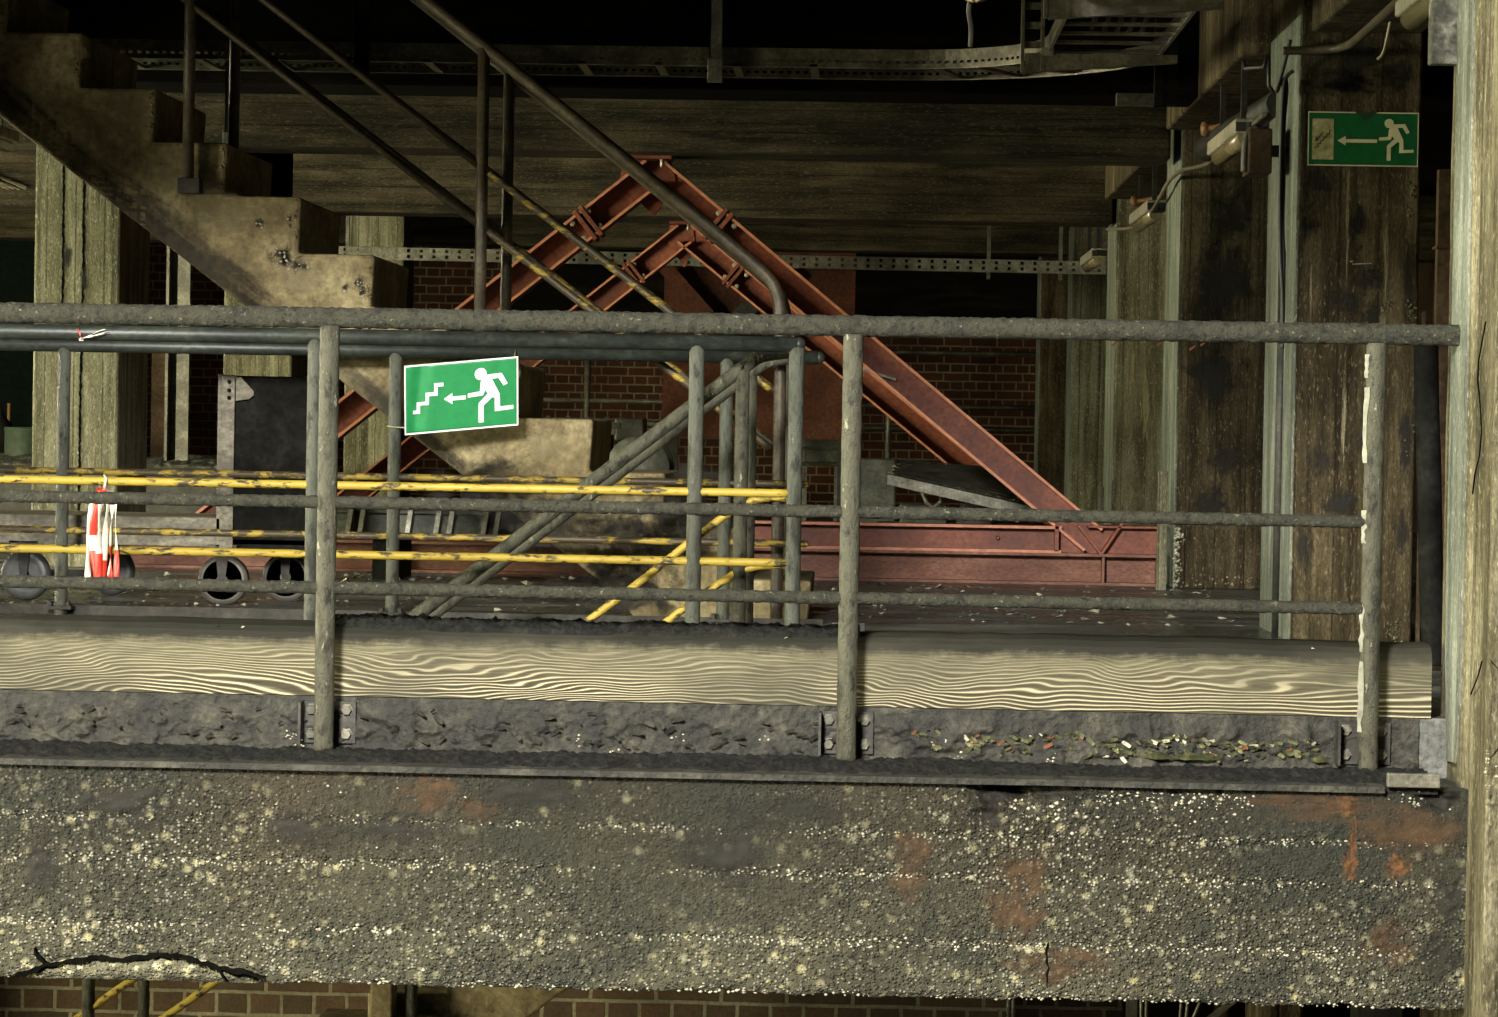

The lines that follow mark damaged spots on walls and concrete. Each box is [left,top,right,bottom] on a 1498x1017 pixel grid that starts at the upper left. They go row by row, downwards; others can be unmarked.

corrosion [1336,795,1358,880]
crack [14,946,265,982]